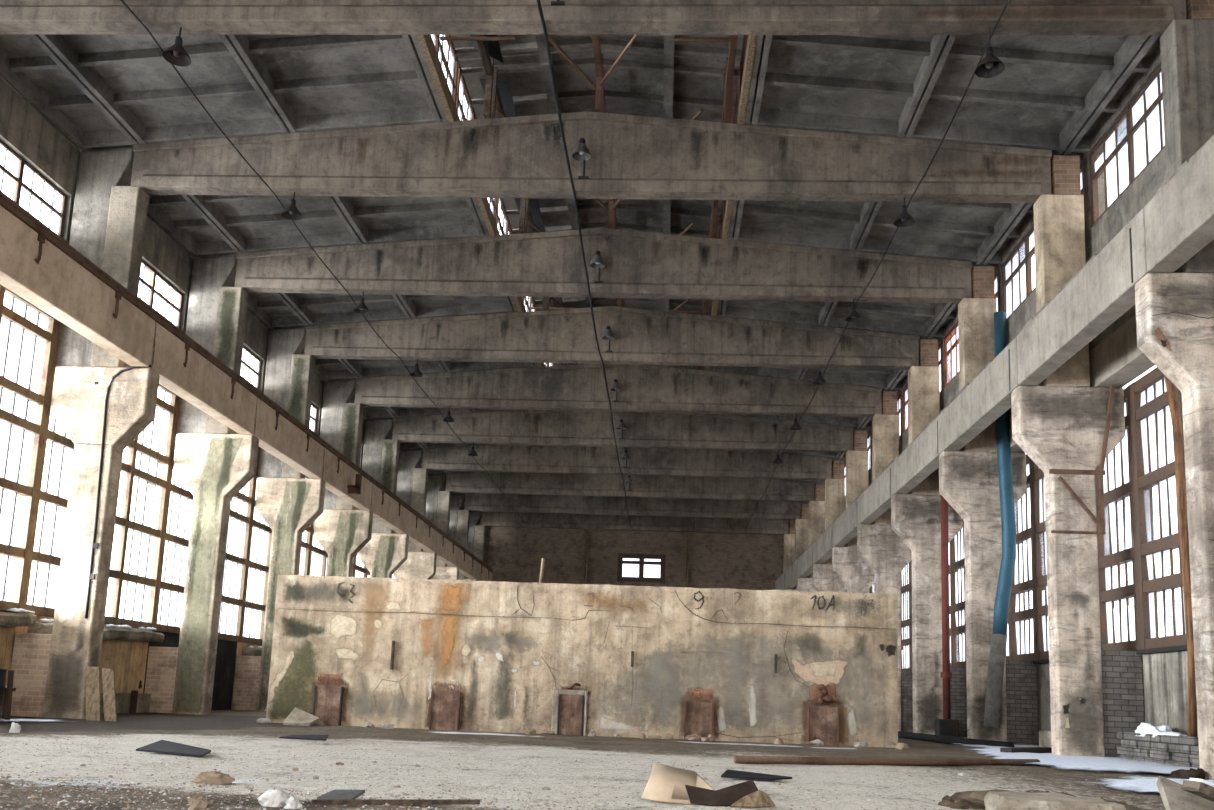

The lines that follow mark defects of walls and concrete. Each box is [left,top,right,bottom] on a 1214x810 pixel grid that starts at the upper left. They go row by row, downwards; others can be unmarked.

damp [217,438,233,497]
damp [189,512,200,592]
damp [269,482,305,621]
corrosion [422,585,469,665]
damp [593,636,883,727]